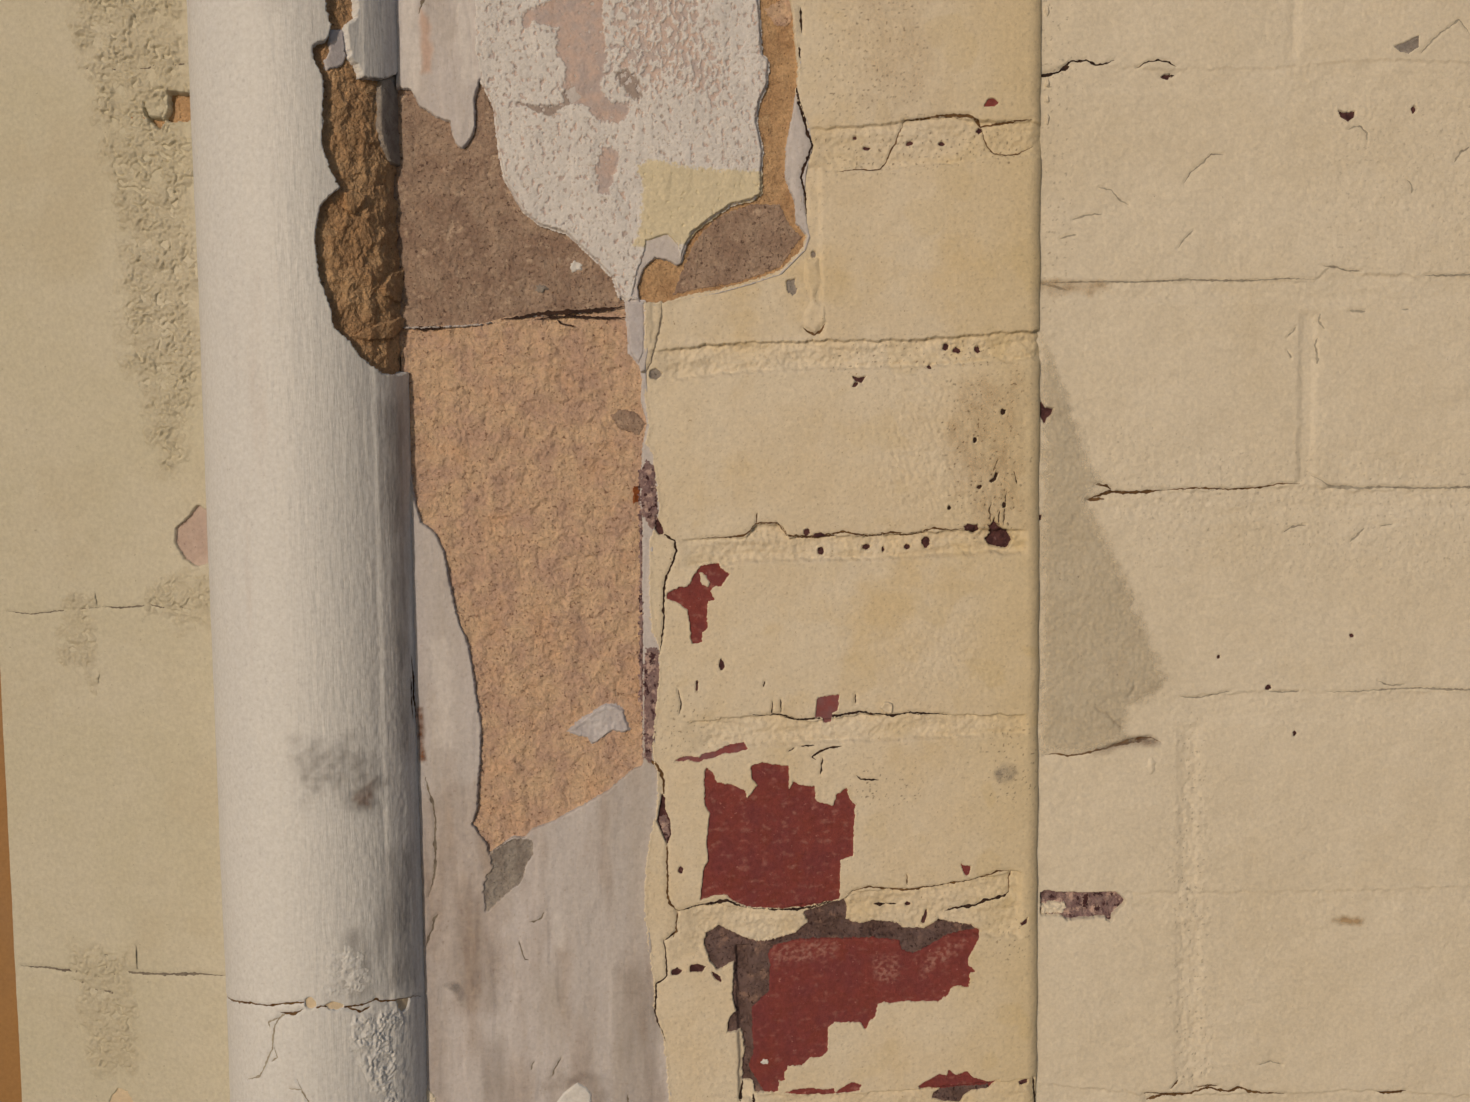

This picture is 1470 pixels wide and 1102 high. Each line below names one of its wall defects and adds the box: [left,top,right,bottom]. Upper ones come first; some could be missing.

spalling [313,0,816,911]
flaking render [177,506,208,566]
peeling [804,528,827,555]
crack [659,459,1017,653]
crack [753,681,946,781]
crack [651,760,665,794]
peeling [671,742,979,1095]
crack [654,847,1010,1039]
spalling [1020,890,1124,925]
peeling [557,1082,592,1102]
peeling [919,1070,995,1102]